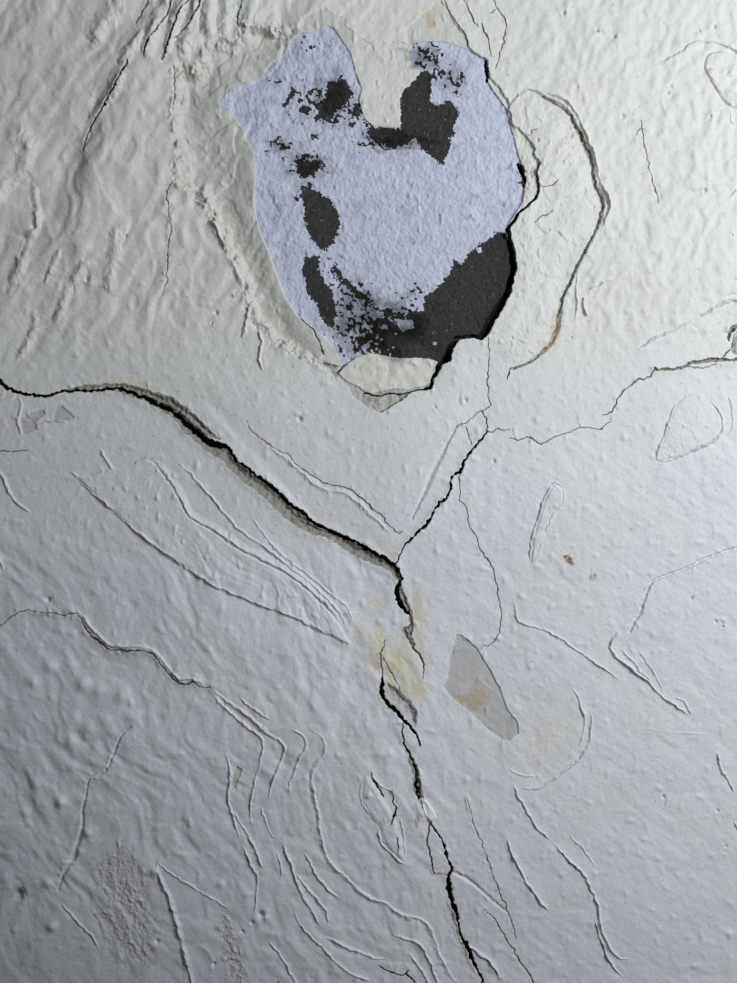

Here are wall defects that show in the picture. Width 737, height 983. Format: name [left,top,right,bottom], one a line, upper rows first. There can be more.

peeling [170,1,541,413]
crack [0,337,737,983]
peeling [444,635,519,741]